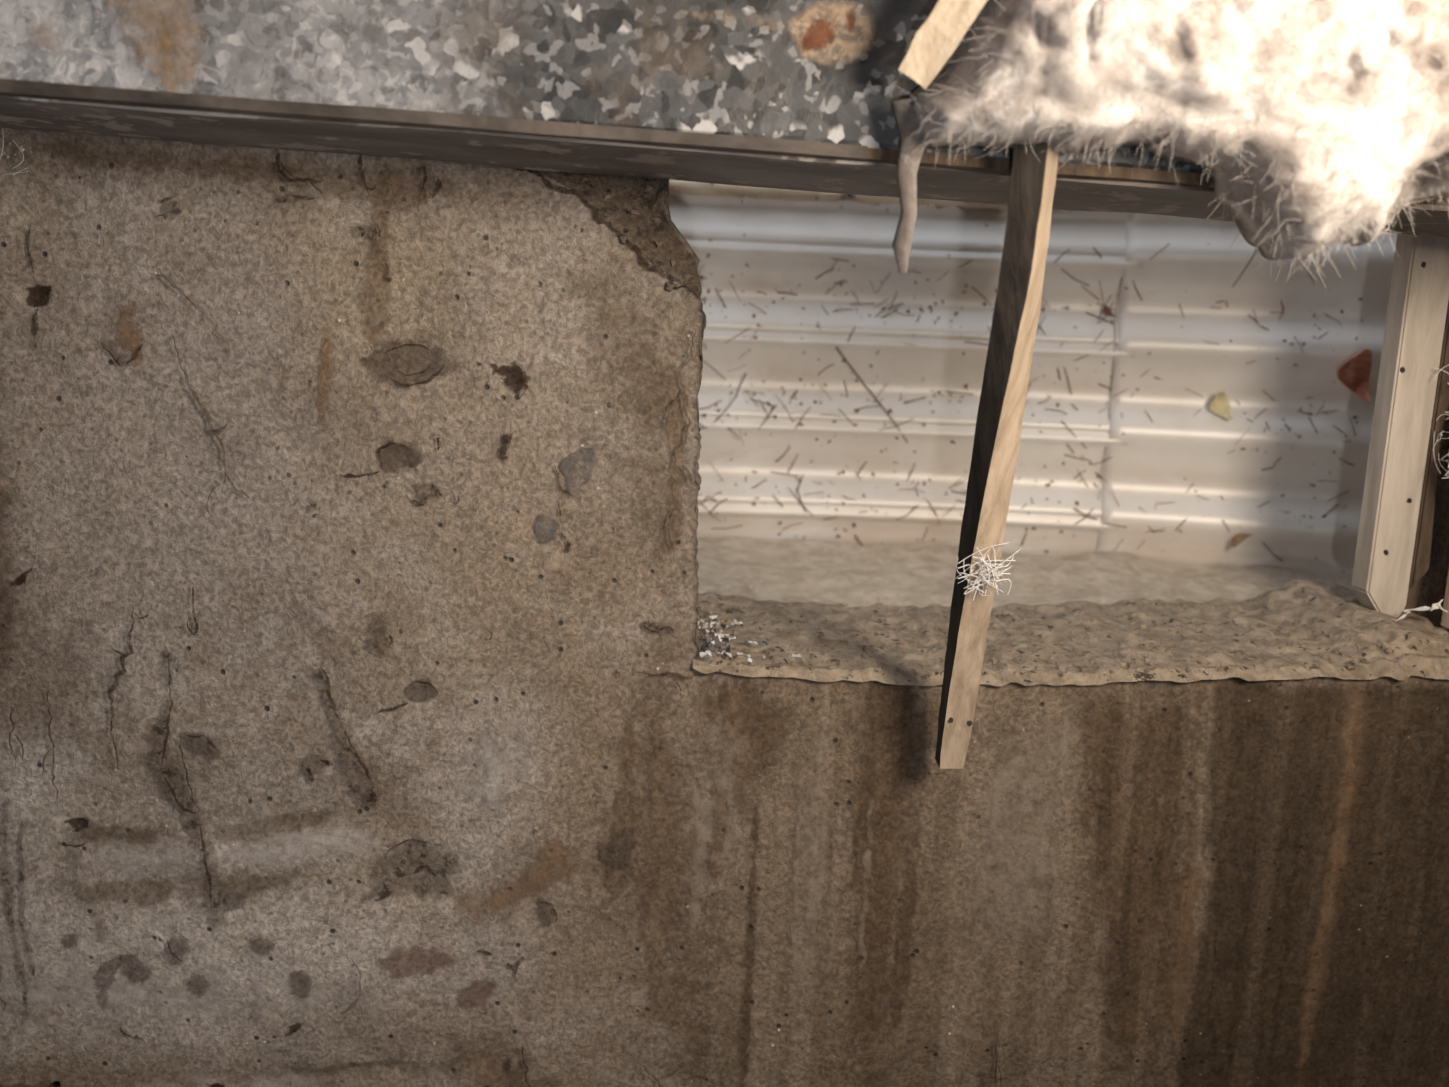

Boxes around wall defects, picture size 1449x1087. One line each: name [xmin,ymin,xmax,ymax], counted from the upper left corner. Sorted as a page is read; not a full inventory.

corrosion [777,2,873,62]
spalling [517,169,701,300]
crack [107,605,148,770]
crack [187,587,199,635]
water stain [0,780,225,1015]
water stain [605,687,788,1087]
water stain [851,681,929,1046]
water stain [1084,677,1449,1087]